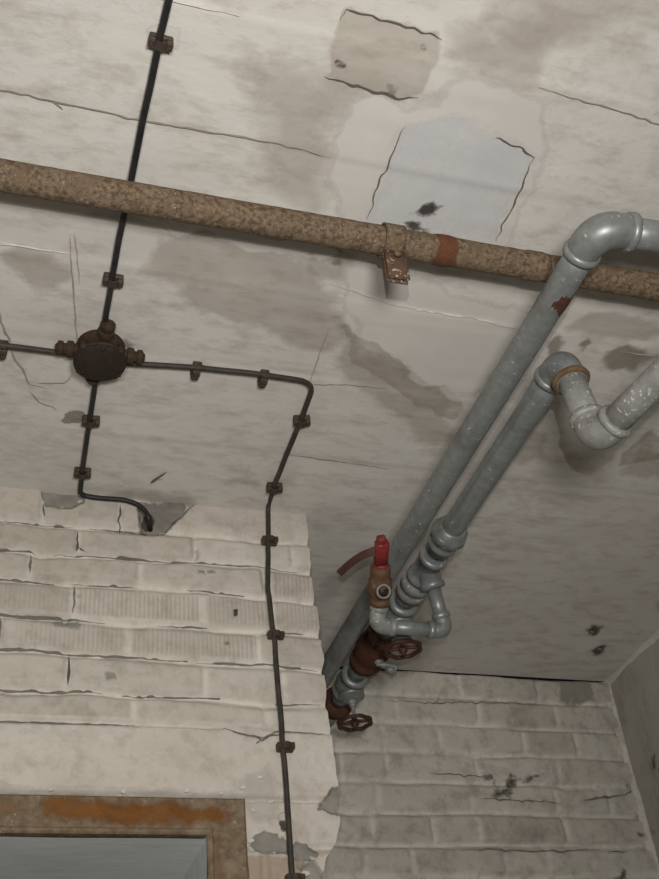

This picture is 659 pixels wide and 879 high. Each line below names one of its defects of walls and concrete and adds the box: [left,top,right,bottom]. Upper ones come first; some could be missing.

crack [0,241,80,341]
crack [0,314,72,411]
spalling [137,502,194,536]
rust [44,797,225,824]
crack [431,773,563,804]
crack [584,791,633,801]
spalling [248,821,323,879]